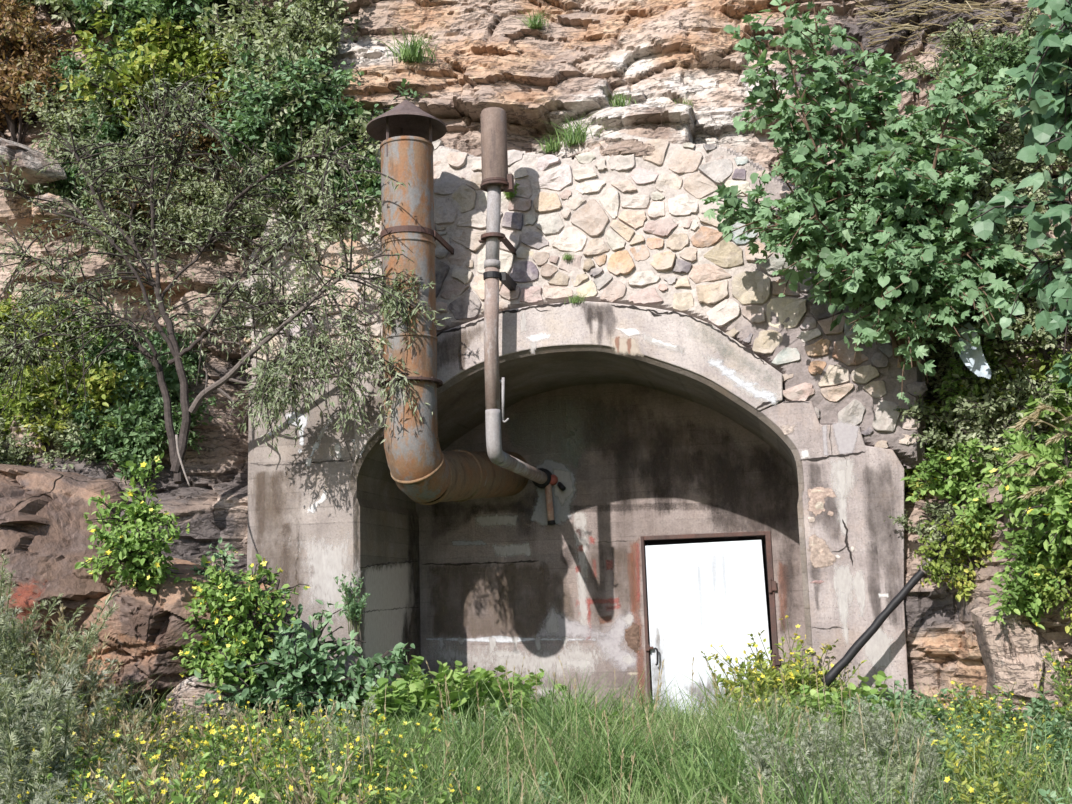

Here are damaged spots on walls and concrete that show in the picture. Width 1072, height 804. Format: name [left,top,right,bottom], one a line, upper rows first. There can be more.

peeling [307,479,326,513]
peeling [531,459,576,525]
water stain [640,424,790,531]
spalling [807,487,854,584]
crack [832,519,854,566]